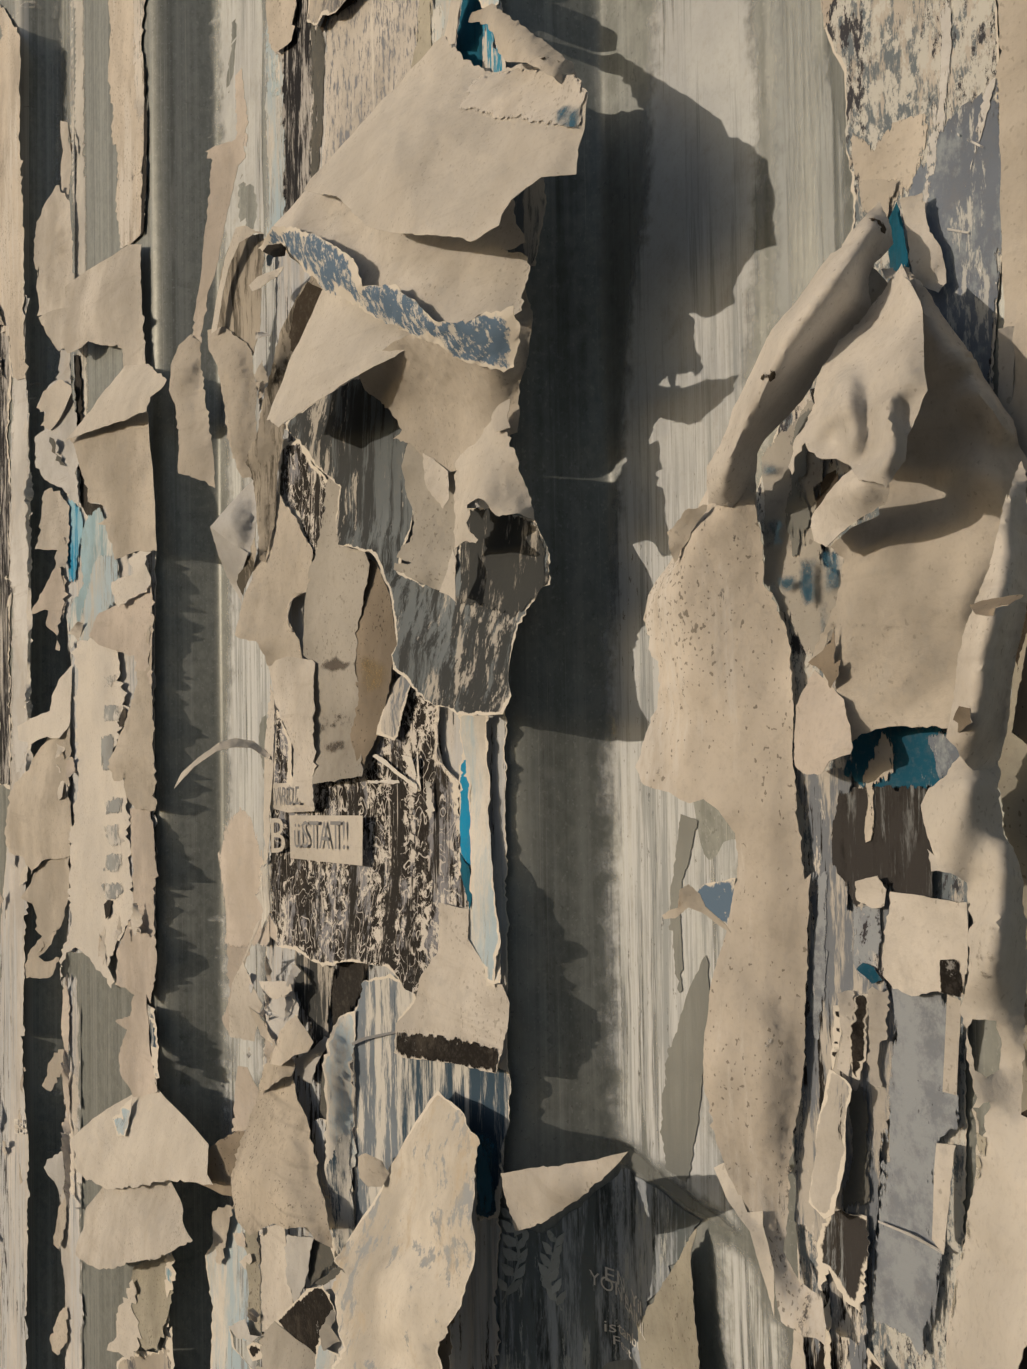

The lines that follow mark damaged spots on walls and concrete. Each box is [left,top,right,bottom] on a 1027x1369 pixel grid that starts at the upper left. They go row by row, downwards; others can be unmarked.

peeling [174,738,270,789]
peeling [660,814,710,1182]